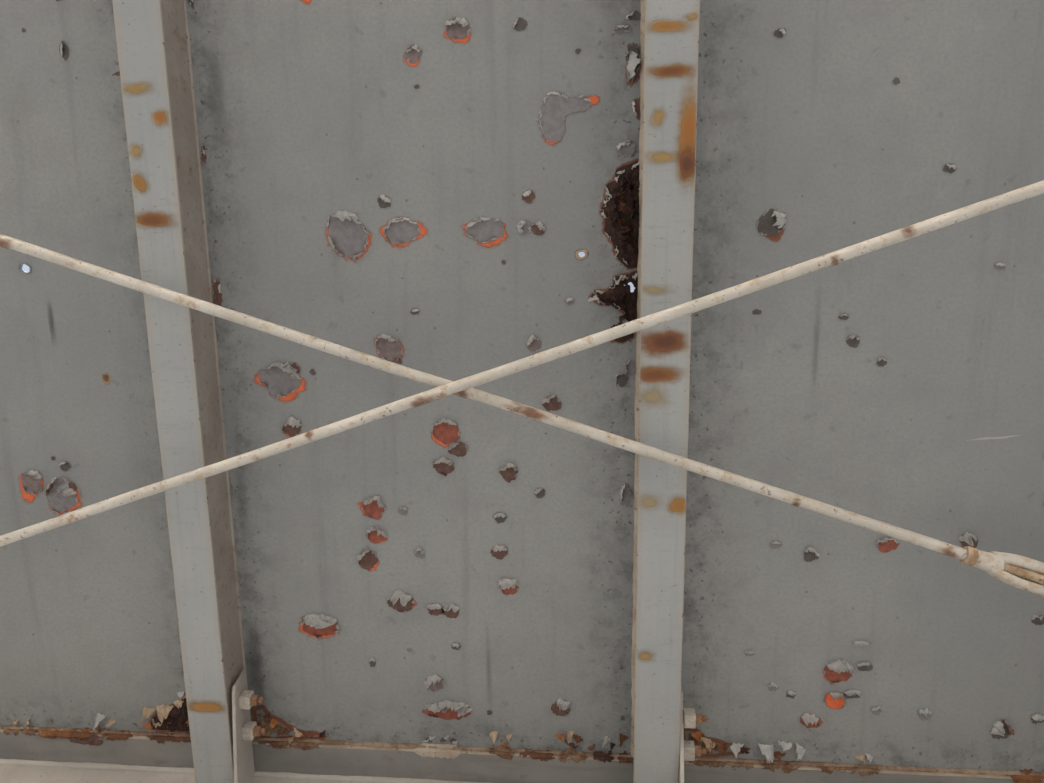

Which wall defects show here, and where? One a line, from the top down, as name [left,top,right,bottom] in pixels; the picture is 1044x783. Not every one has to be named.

corrosion [650,64,693,77]
peeling [326,194,427,260]
peeling [462,217,508,248]
corrosion [588,98,696,403]
peeling [254,362,316,402]
peeling [19,456,82,515]
peeling [299,613,340,639]
peeling [822,659,873,709]
corrosion [3,713,133,746]
corrosion [142,691,223,744]
corrosion [489,730,633,763]
corrosion [684,728,806,773]